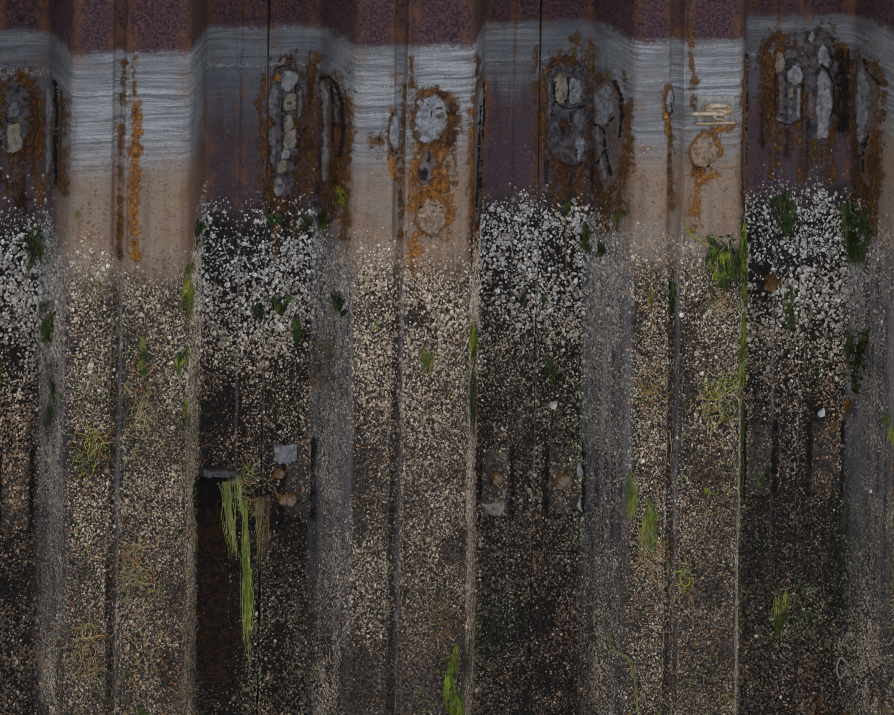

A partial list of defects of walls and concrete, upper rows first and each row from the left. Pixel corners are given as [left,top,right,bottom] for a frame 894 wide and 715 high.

corrosion [115,52,144,264]
spalling [261,46,357,258]
corrosion [531,45,548,195]
spalling [739,18,890,240]